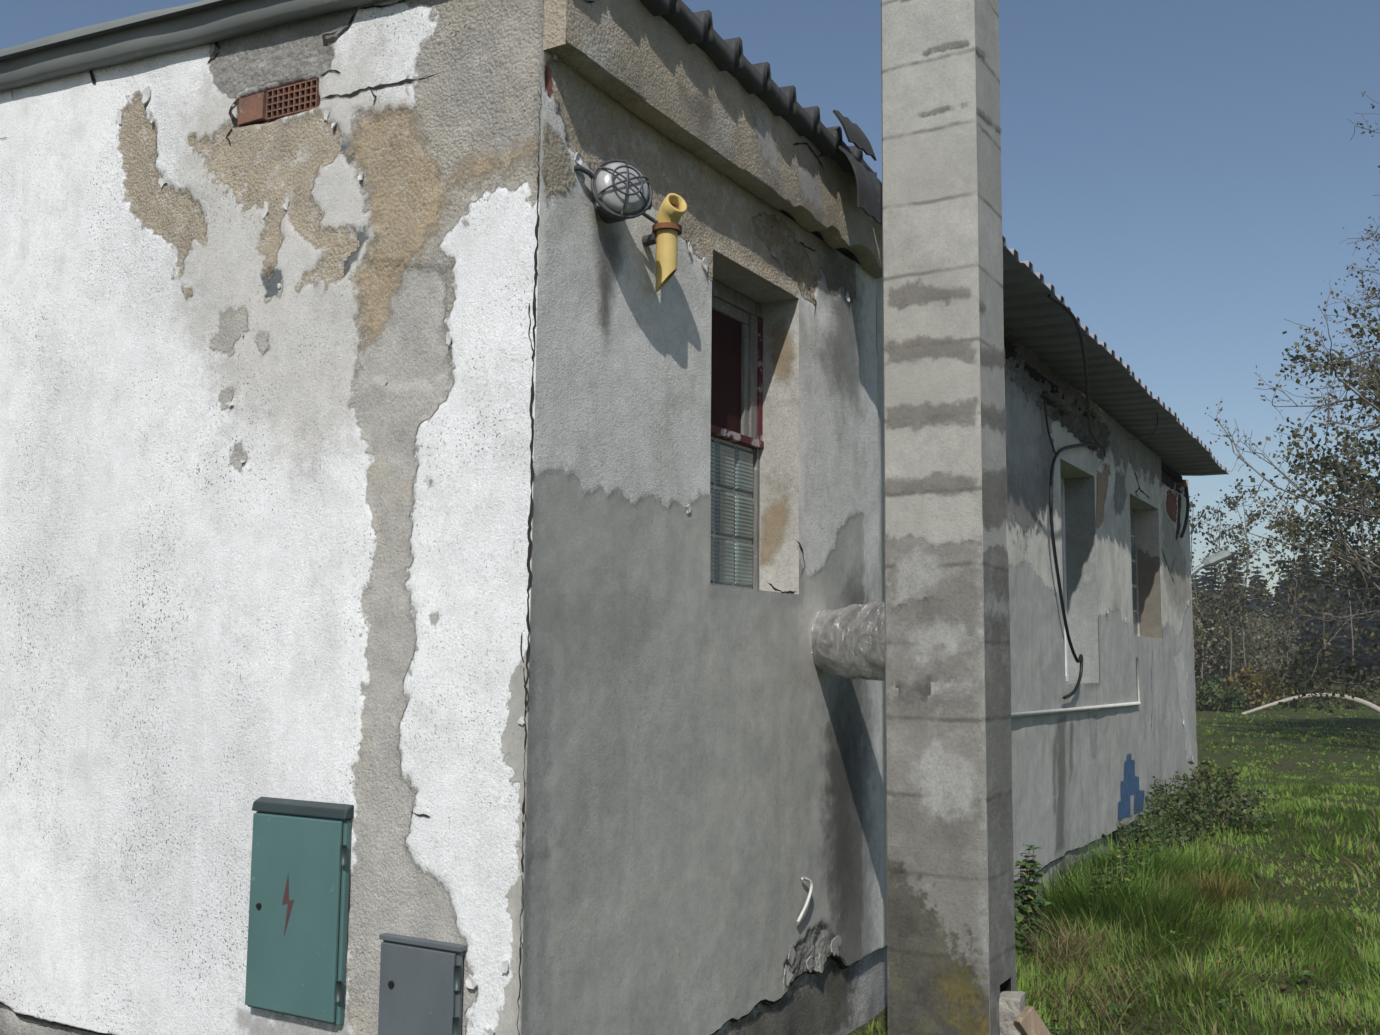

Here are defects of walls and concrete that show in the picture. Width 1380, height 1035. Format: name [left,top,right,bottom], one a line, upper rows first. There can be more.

crack [319,0,439,105]
peeling [116,86,208,299]
water stain [889,281,986,309]
water stain [772,325,794,378]
spalling [1004,327,1112,528]
peeling [188,0,865,1035]
water stain [761,500,787,563]
spalling [1161,472,1187,540]
water stain [885,336,1054,1035]
crack [0,1002,111,1035]
water stain [725,959,862,1035]
crack [711,946,887,1035]